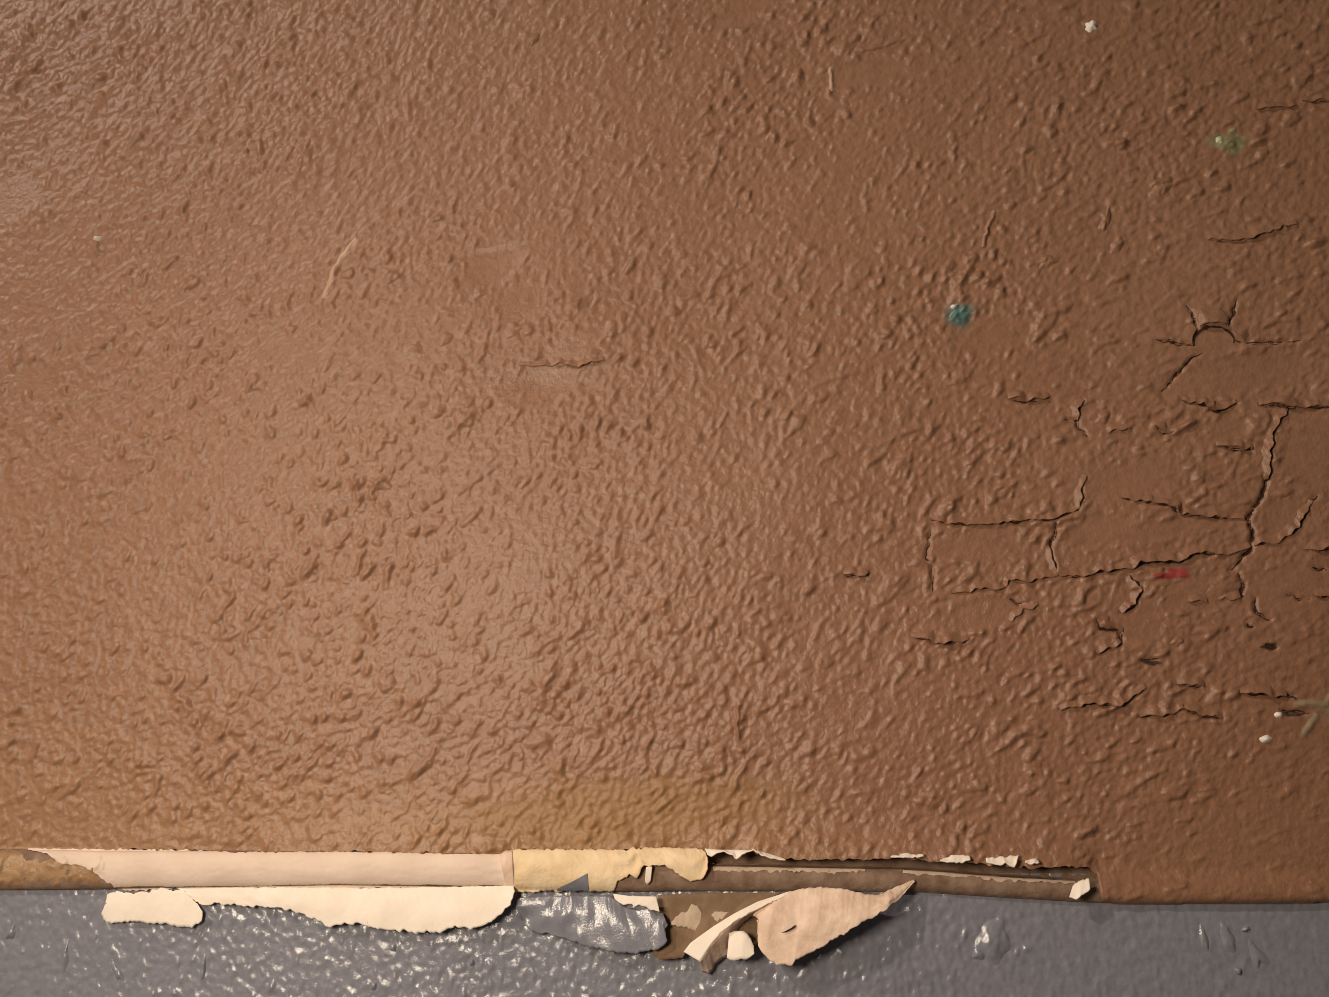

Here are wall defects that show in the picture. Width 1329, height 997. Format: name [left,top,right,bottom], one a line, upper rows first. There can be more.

crack [519,356,605,367]
crack [925,299,1329,719]
crack [911,630,969,645]
peeling [28,847,1101,974]